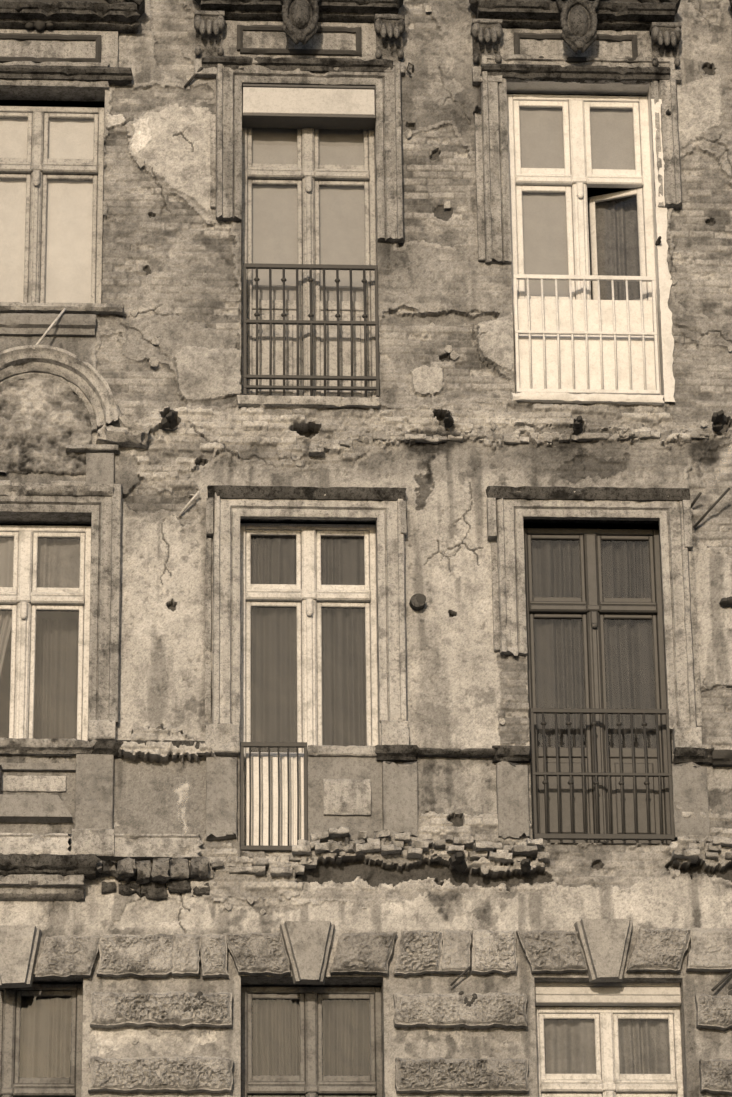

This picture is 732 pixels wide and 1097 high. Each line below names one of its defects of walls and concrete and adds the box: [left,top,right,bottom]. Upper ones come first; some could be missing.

crack [173,124,194,152]
crack [696,133,732,178]
crack [152,167,172,220]
flaking render [96,0,732,580]
crack [118,304,179,360]
flaking render [0,377,93,476]
crack [424,482,484,572]
flaking render [424,533,476,595]
flaking render [497,652,530,746]
flaking render [701,684,732,750]
flaking render [676,805,732,839]
flaking render [109,811,732,931]